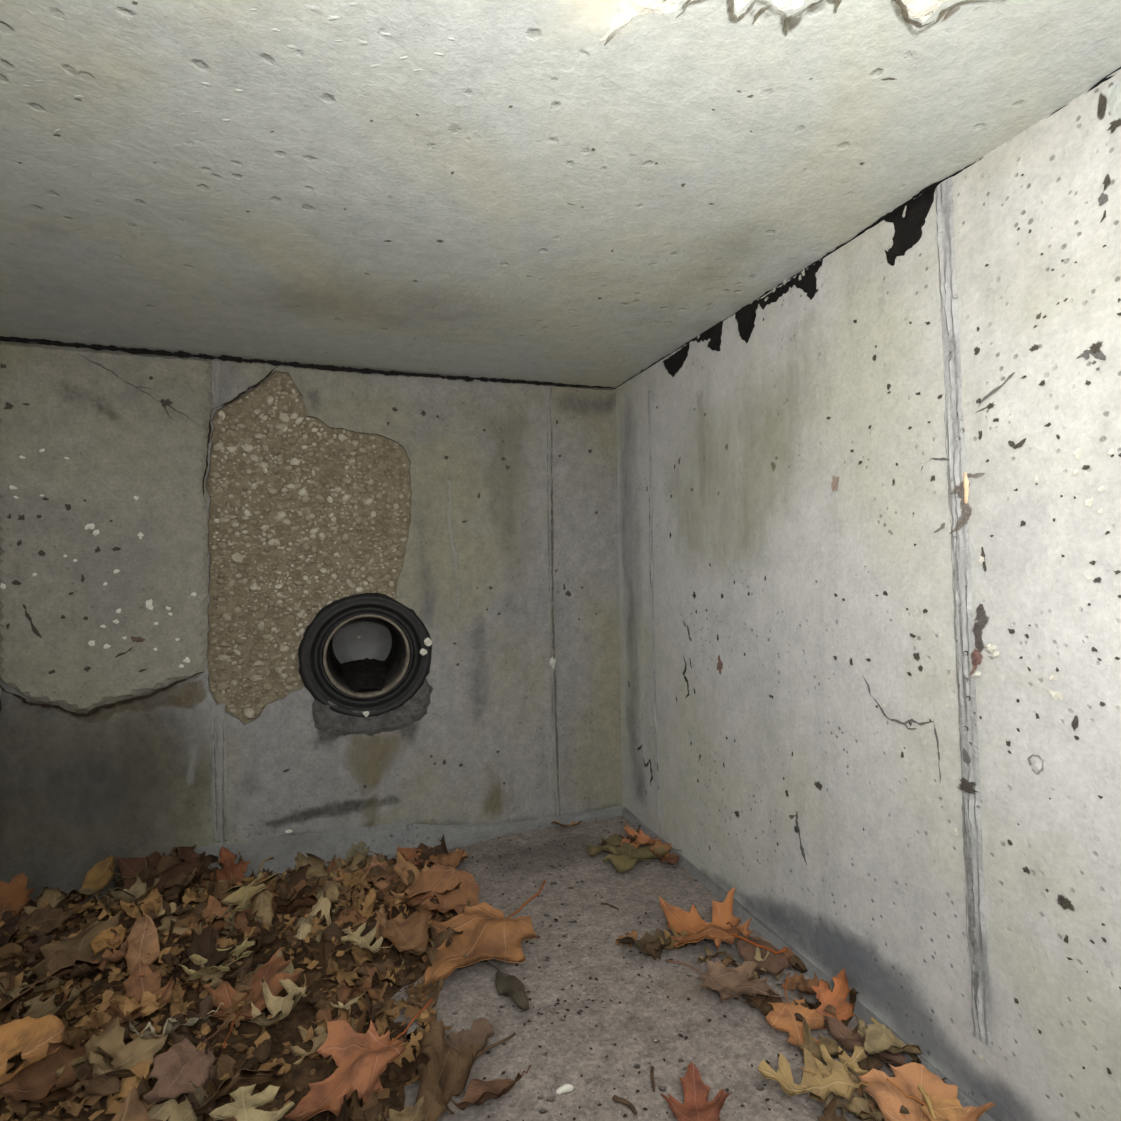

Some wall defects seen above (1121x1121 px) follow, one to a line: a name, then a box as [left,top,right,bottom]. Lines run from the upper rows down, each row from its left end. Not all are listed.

crack [1045,67,1121,119]
crack [0,157,984,502]
crack [976,372,1015,413]
peeling [0,341,411,724]
crack [863,677,941,780]
damp [269,800,374,824]